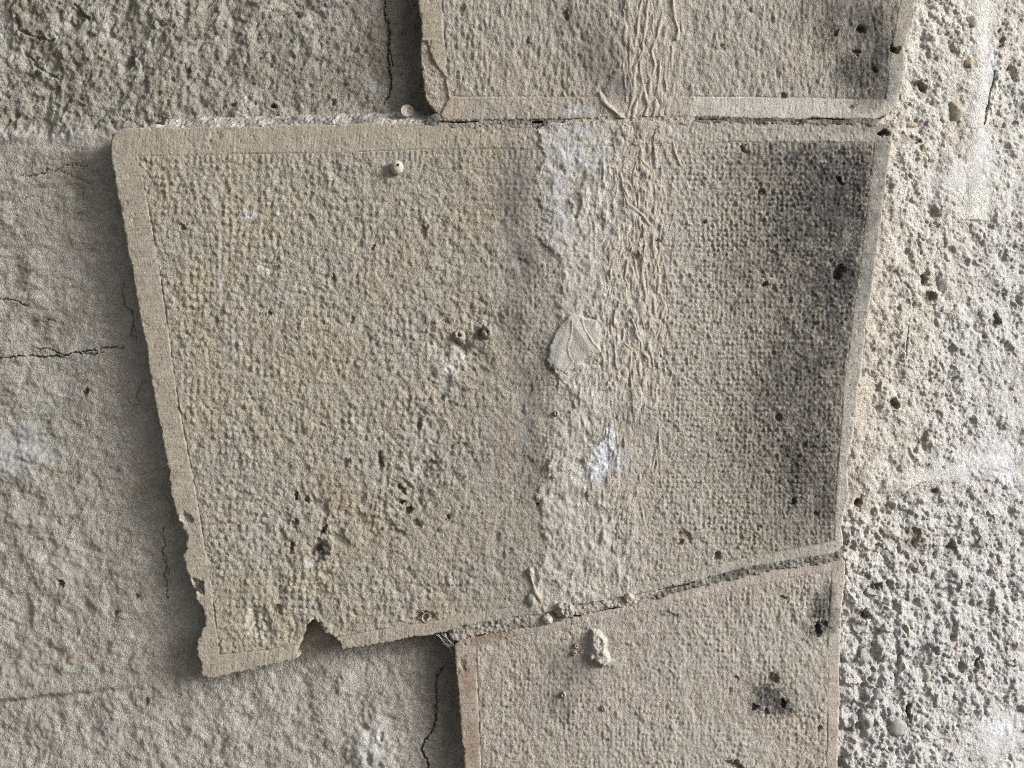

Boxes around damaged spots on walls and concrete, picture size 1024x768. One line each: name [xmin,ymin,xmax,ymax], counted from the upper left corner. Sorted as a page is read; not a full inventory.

crack [384,3,392,101]
leakage [546,0,685,414]
leakage [510,242,534,280]
crack [0,347,108,359]
leakage [587,426,626,485]
spalling [180,510,195,529]
leakage [526,446,568,554]
spalling [191,577,205,596]
spalling [270,604,285,615]
crack [421,667,444,768]